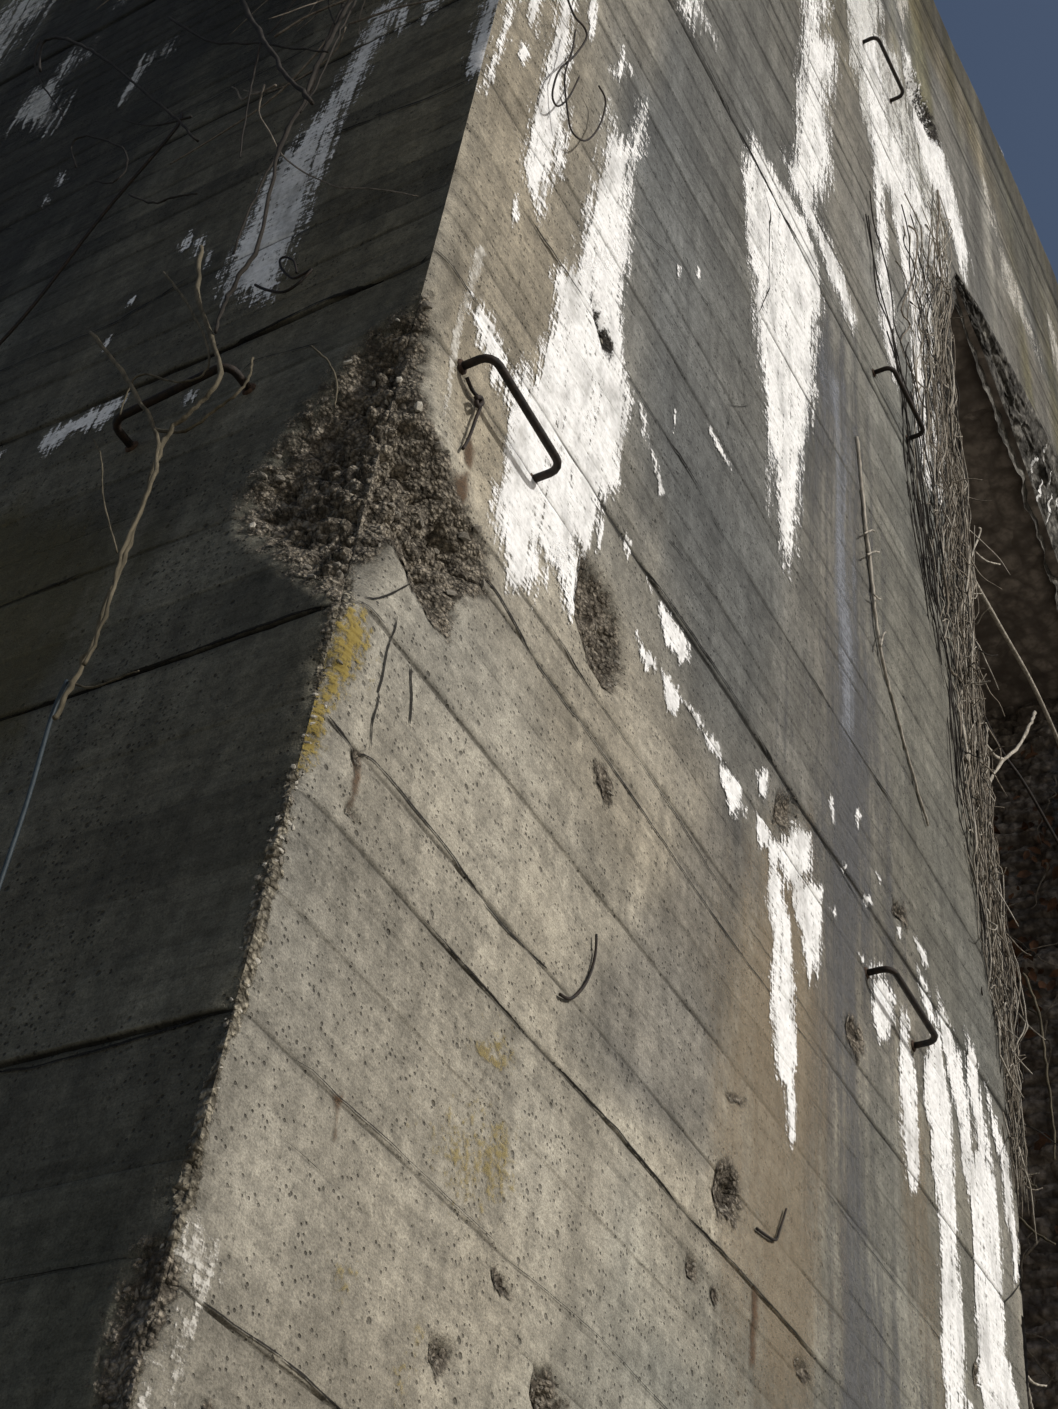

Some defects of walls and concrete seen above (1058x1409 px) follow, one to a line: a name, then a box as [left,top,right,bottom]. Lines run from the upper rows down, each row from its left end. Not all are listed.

spalling [573,553,626,693]
spalling [85,293,494,1409]
spalling [711,1156,743,1229]
spalling [529,1368,570,1409]